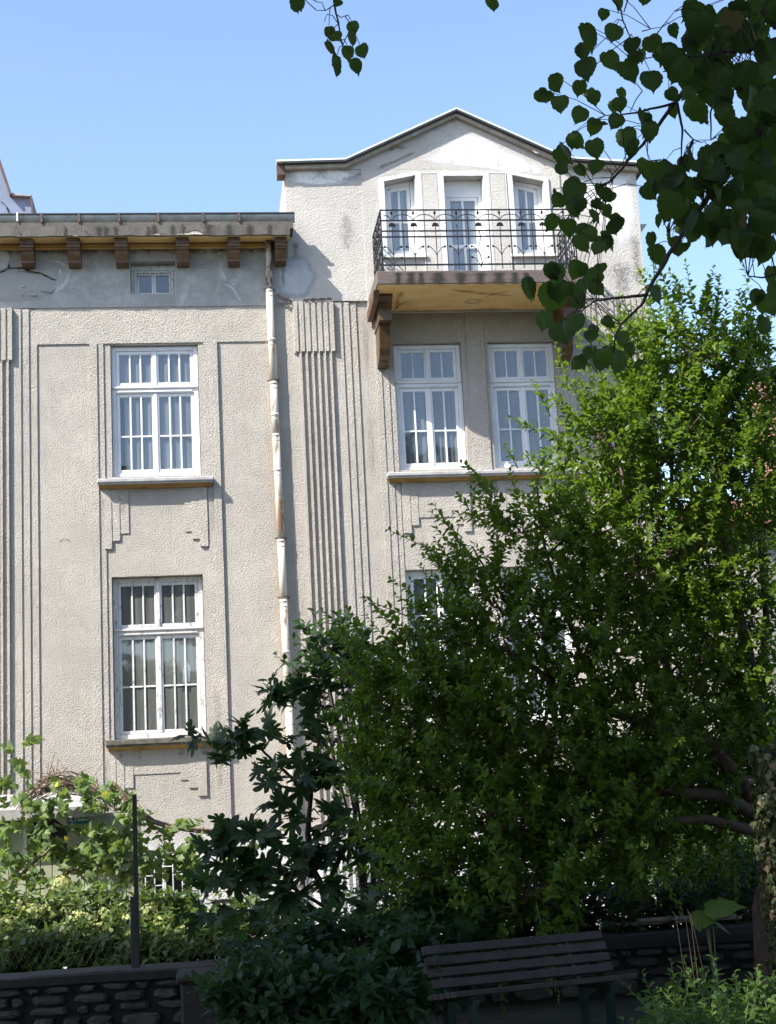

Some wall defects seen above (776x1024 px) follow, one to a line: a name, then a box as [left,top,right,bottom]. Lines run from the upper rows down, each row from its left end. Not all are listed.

crack [8,267,56,293]